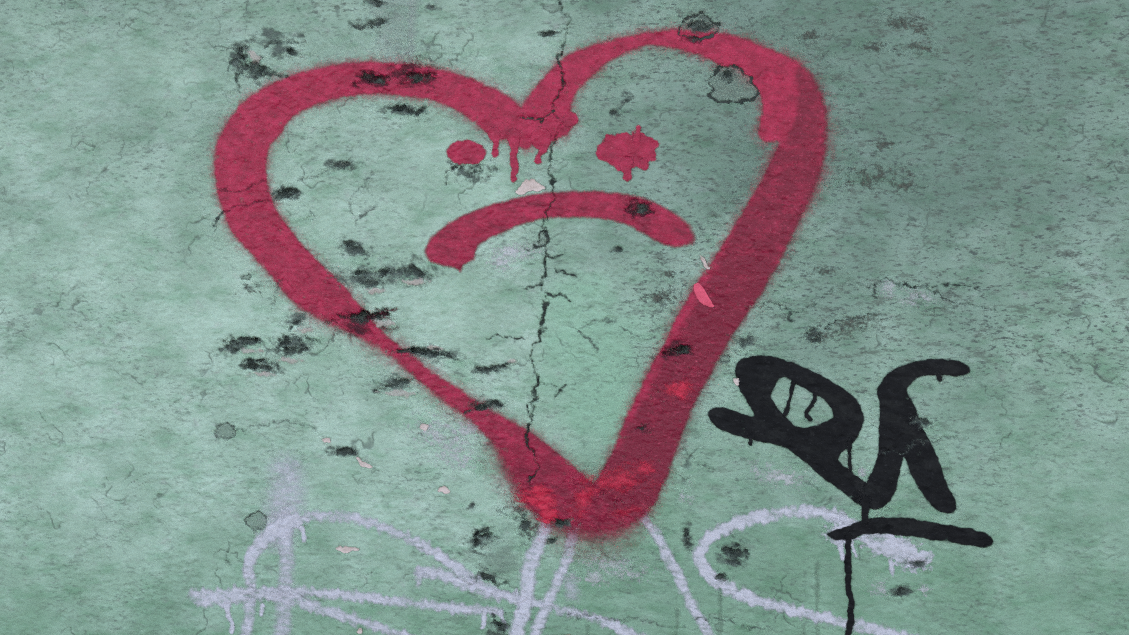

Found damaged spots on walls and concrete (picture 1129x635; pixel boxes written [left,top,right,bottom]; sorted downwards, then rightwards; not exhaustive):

flaking render [515,179,545,195]
crack [488,1,577,482]